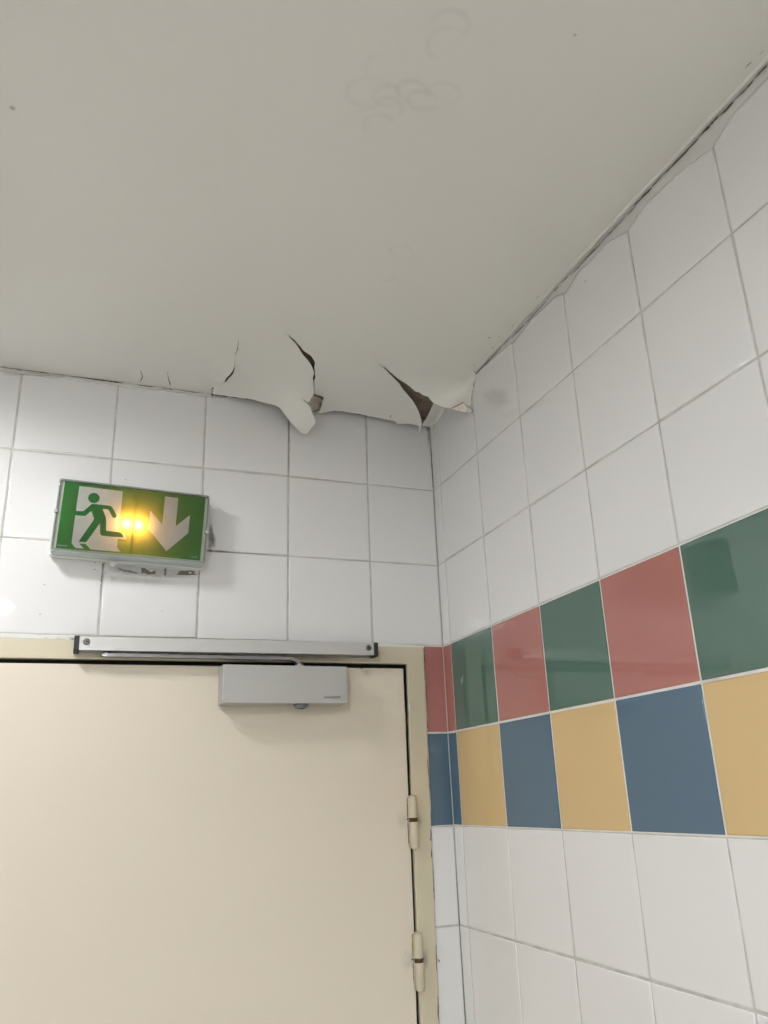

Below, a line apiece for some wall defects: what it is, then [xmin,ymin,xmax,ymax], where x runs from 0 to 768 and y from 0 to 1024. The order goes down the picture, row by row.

crack [471,65,767,399]
crack [2,367,246,399]
peeling [212,331,476,434]